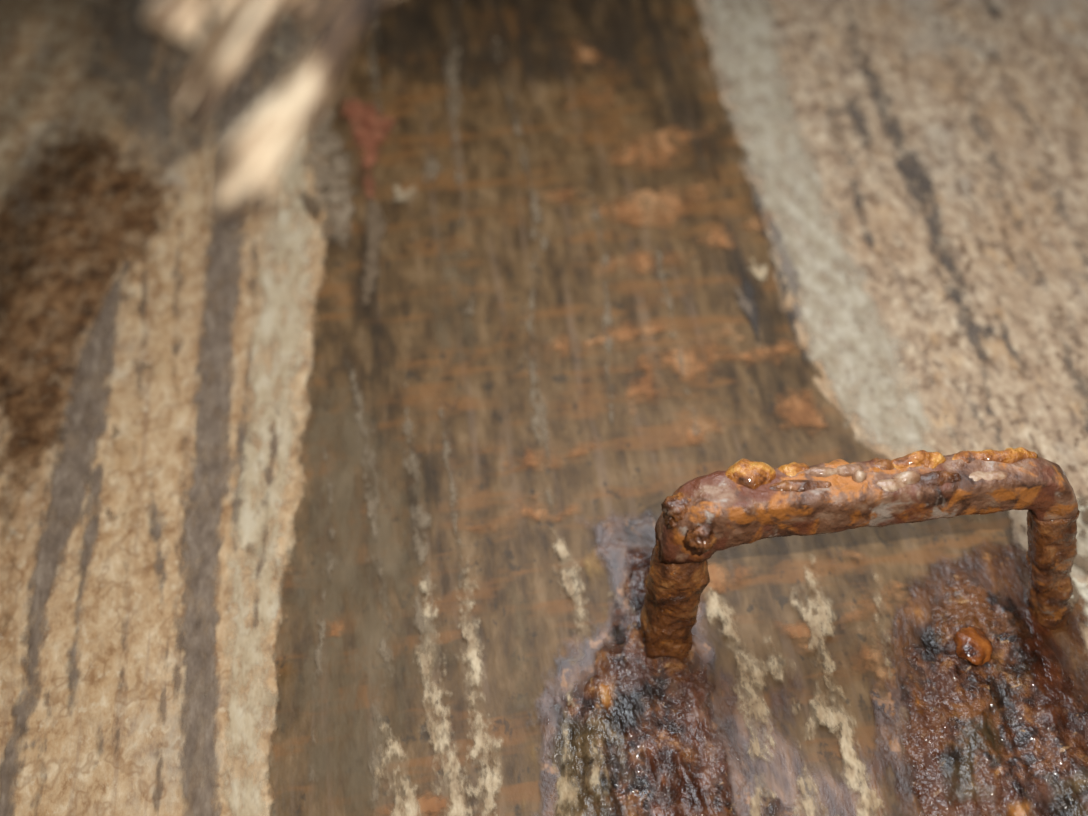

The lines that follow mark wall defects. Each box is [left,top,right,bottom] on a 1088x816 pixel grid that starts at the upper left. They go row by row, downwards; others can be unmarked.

damp [847,8,1019,360]
damp [0,261,127,816]
damp [151,506,165,579]
damp [160,0,932,816]
rust [536,511,656,816]
damp [644,511,1013,816]
rust [685,541,1030,816]
rust [725,447,1038,492]
rust [1027,595,1088,705]